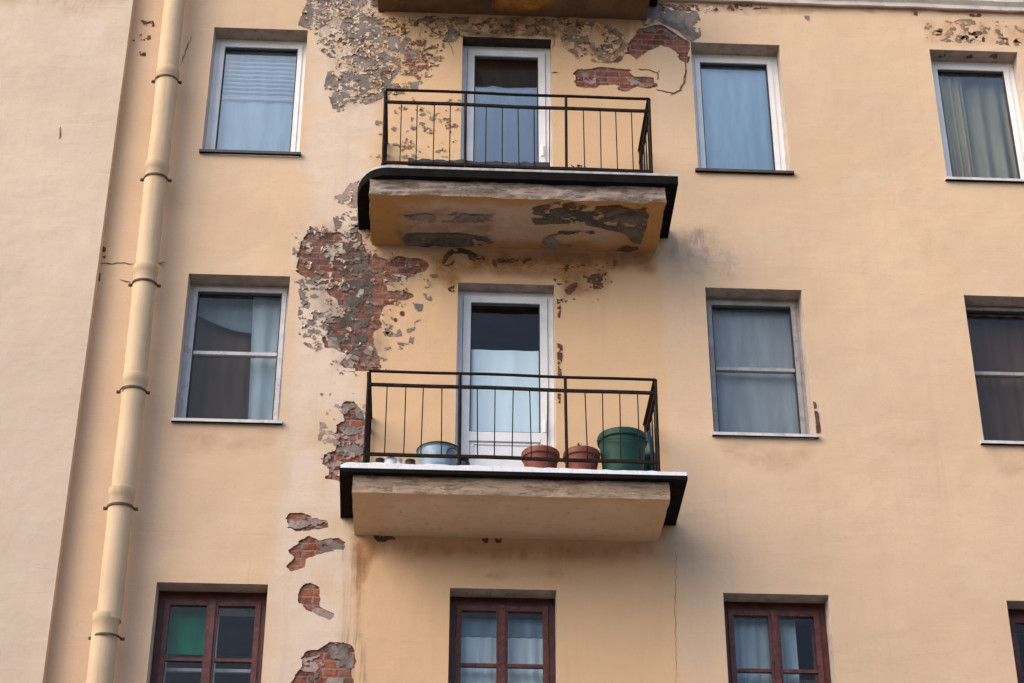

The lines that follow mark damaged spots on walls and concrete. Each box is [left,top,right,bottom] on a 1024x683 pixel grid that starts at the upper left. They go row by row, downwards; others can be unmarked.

peeling [298,0,761,159]
peeling [914,11,1024,59]
peeling [292,180,531,376]
peeling [318,393,365,477]